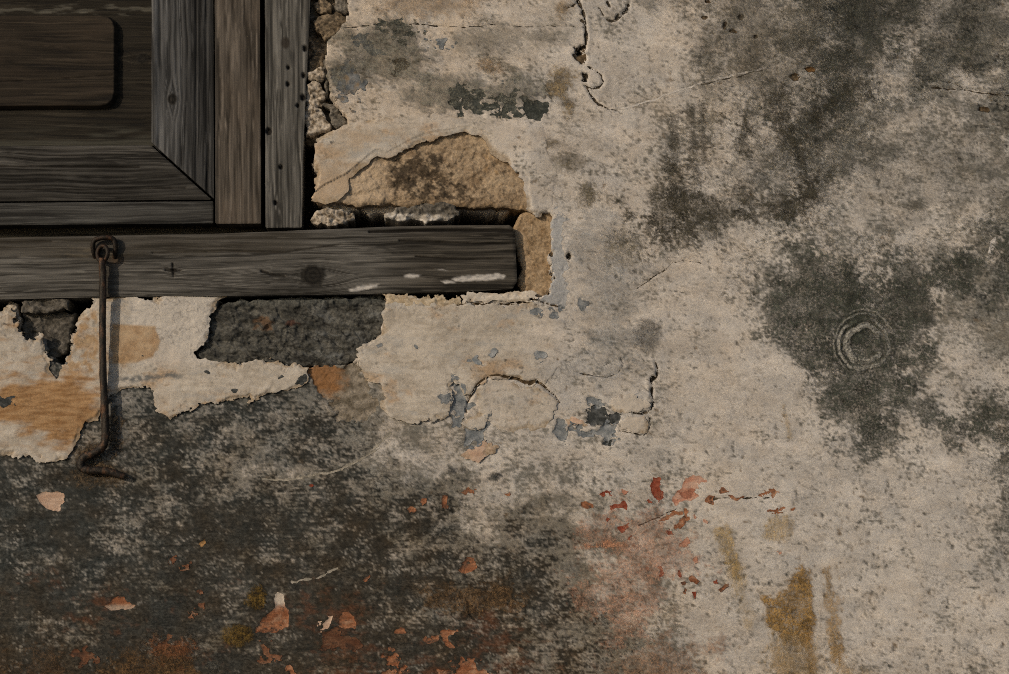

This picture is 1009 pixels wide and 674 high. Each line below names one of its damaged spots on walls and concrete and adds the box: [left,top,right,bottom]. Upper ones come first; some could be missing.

peeling [351,17,457,77]
crack [344,0,630,111]
spalling [573,45,588,82]
water stain [581,183,596,207]
peeling [0,55,651,463]
water stain [616,0,1009,482]
peeling [36,491,65,511]
peeling [105,596,135,611]
corrosion [761,565,841,673]